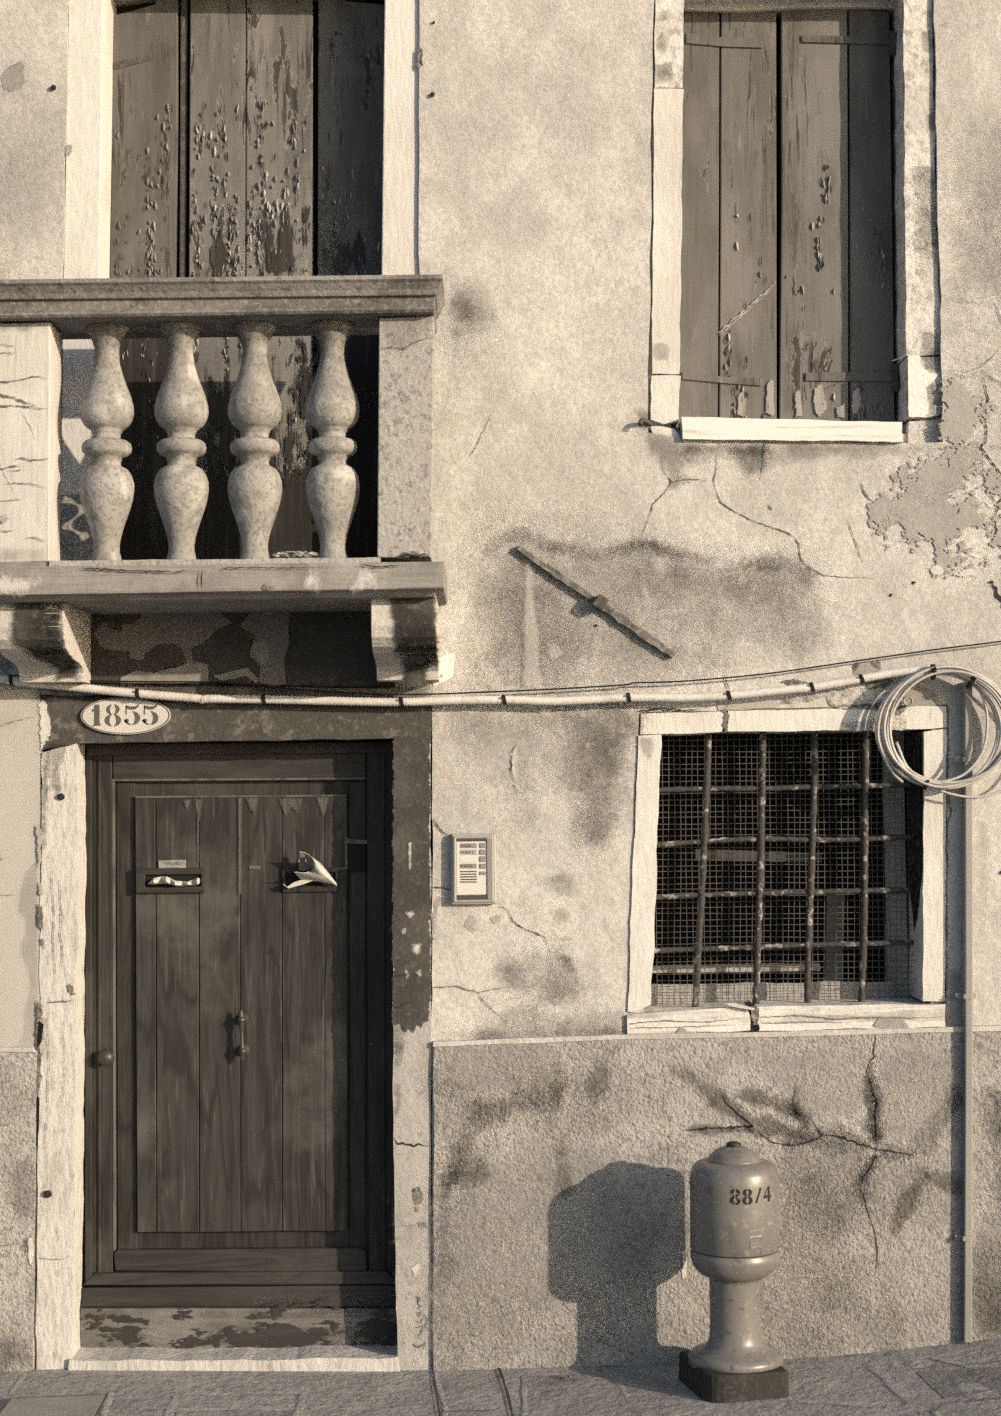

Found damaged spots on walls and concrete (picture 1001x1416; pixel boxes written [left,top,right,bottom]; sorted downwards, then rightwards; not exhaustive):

crack [642,441,874,579]
peeling [867,356,1001,579]
peeling [94,612,290,686]
peeling [431,653,455,686]
crack [631,705,952,1279]
water stain [885,1059,946,1131]
water stain [441,1170,608,1308]